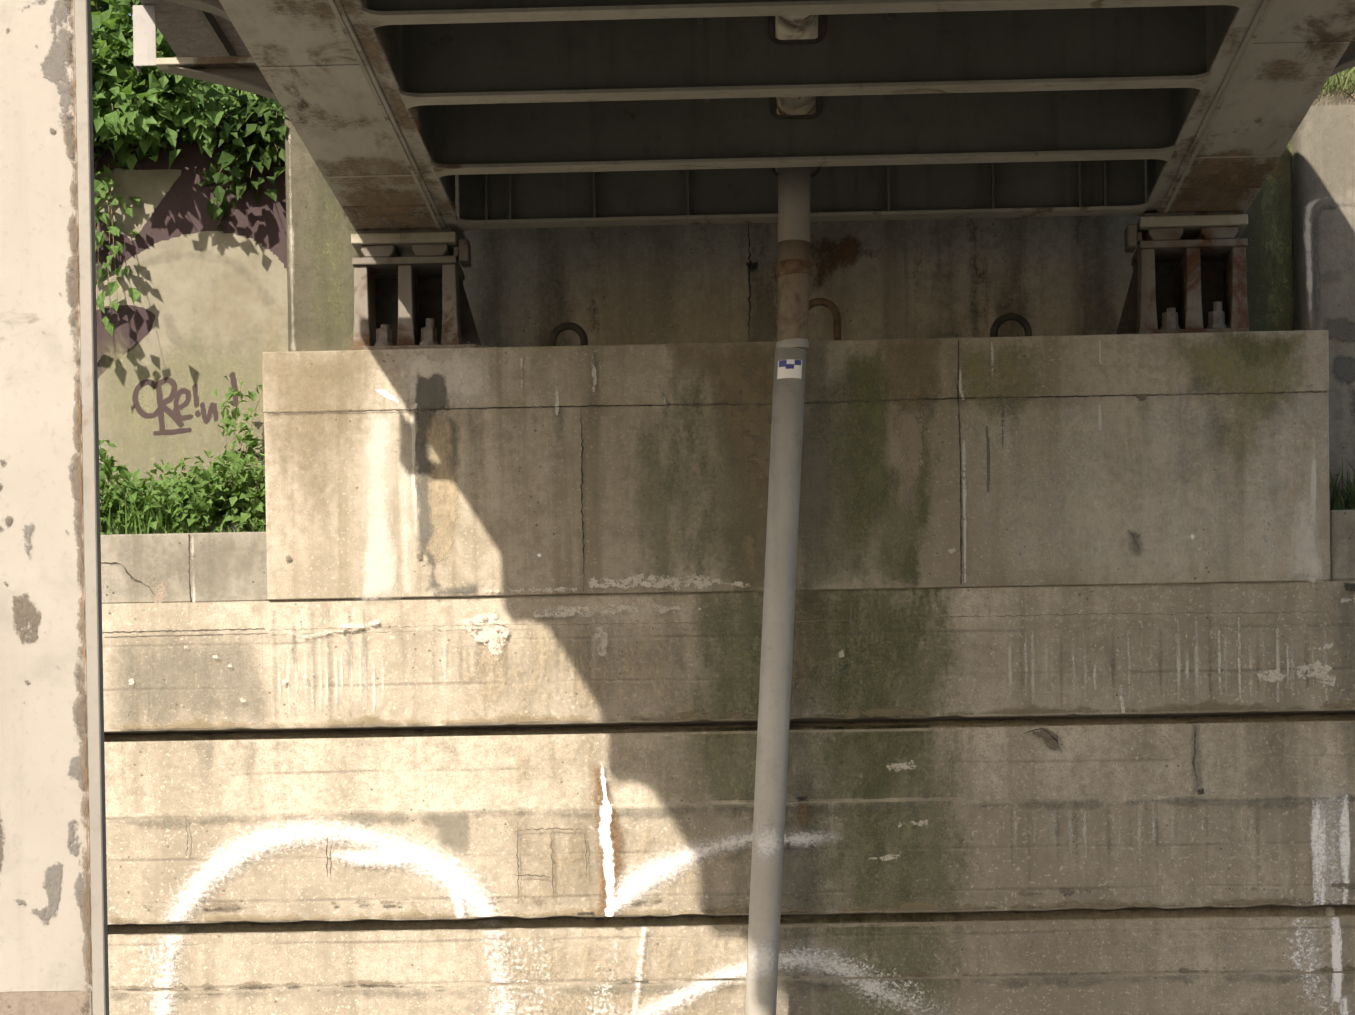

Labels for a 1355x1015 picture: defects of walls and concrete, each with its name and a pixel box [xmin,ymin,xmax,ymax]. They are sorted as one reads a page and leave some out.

peeling [24,0,74,129]
corrosion [810,236,871,289]
damp [1181,335,1301,452]
damp [843,356,931,584]
peeling [12,594,41,643]
peeling [22,524,34,554]
crack [101,562,168,603]
damp [434,385,749,661]
peeling [68,756,80,779]
peeling [16,820,83,925]